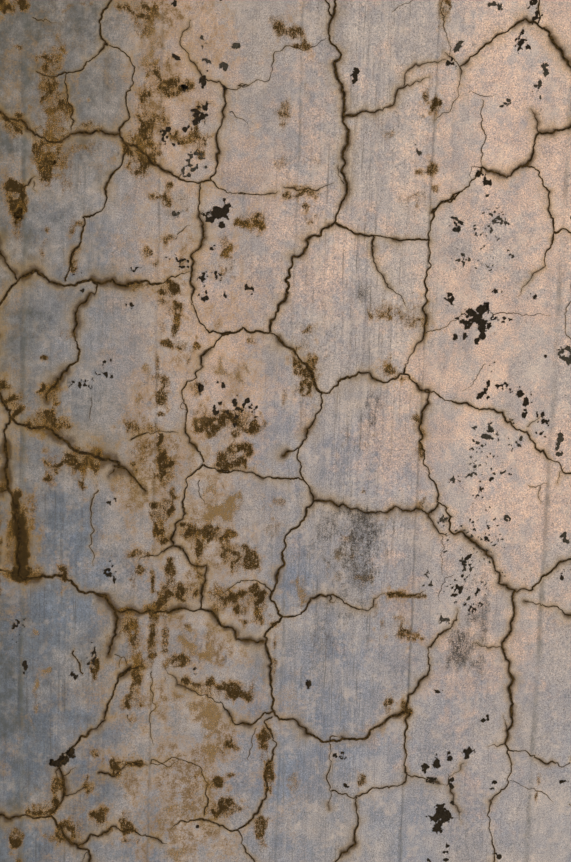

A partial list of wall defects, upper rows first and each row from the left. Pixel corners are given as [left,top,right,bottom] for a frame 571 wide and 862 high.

rust [122,62,208,178]
crack [0,0,571,462]
rust [132,278,201,350]
peeling [444,288,513,345]
rust [117,358,177,545]
rust [192,408,267,470]
peeling [476,361,564,457]
peeling [437,422,523,615]
rust [119,522,277,709]
crack [0,333,571,862]
peeling [426,801,456,833]
peeling [421,746,476,789]